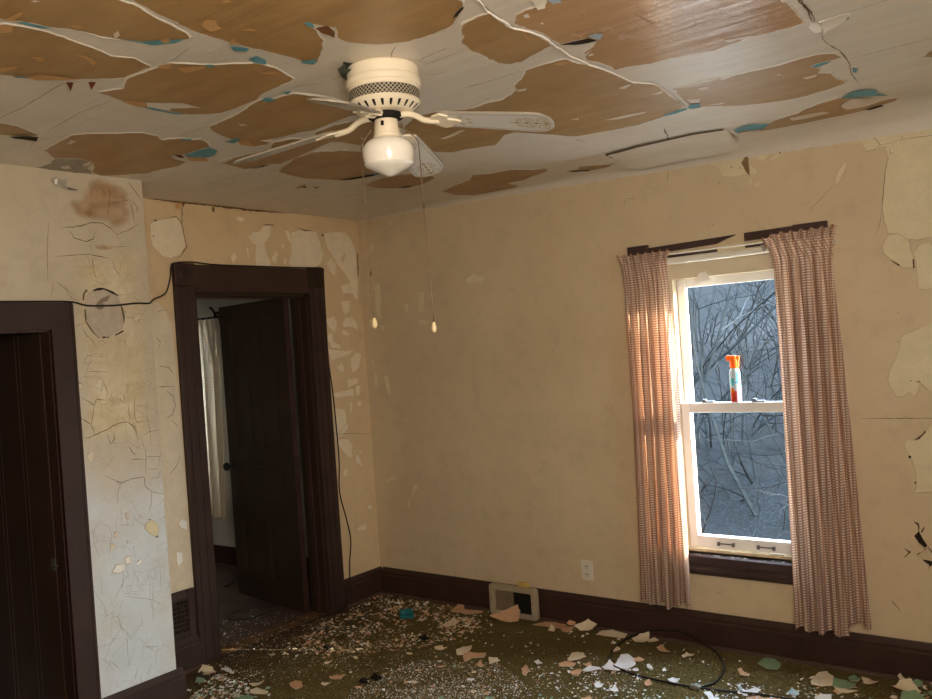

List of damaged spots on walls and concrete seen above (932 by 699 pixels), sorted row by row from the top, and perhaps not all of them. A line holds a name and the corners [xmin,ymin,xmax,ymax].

peeling [0,0,899,189]
crack [798,0,927,83]
leakage [62,177,134,233]
peeling [150,217,186,258]
peeling [441,168,548,196]
peeling [875,129,932,290]
leakage [68,242,158,448]
crack [47,181,180,507]
peeling [230,224,362,476]
peeling [888,321,932,397]
peeling [83,301,194,699]
peeling [903,423,932,493]